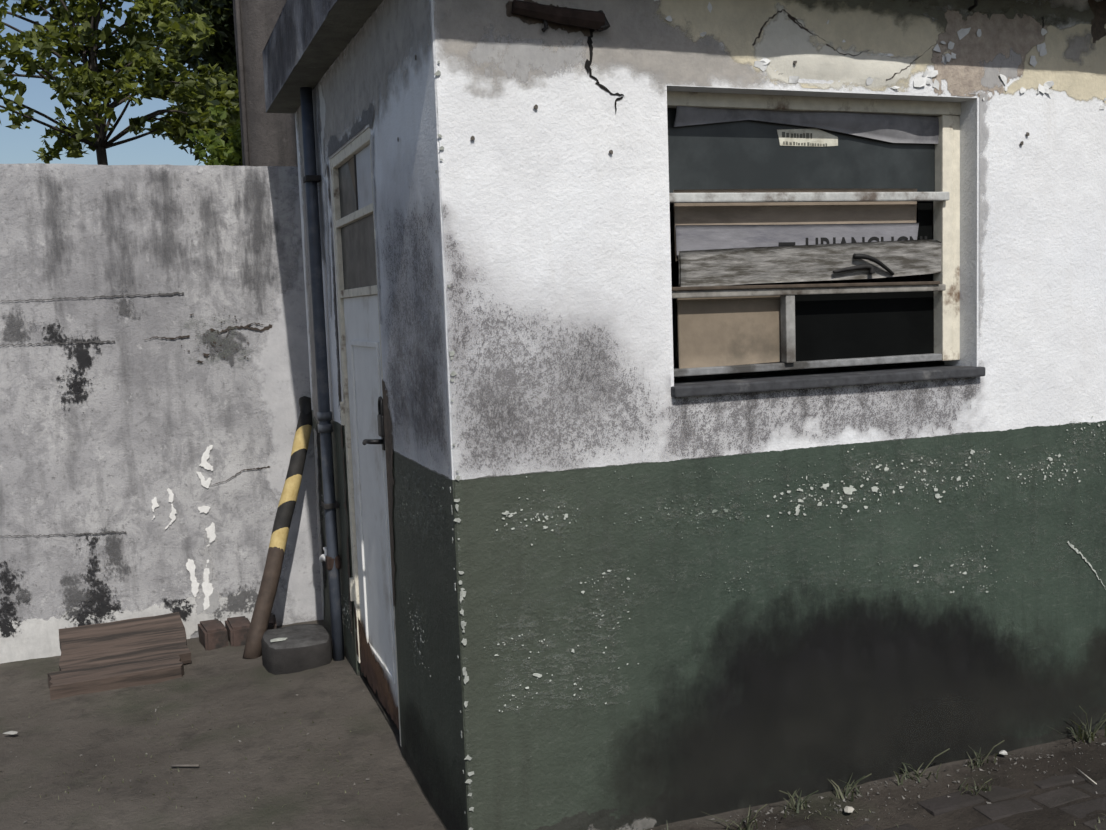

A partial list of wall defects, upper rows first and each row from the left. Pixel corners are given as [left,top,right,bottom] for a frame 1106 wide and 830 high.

crack [585,29,624,111]
peeling [654,0,1106,109]
leakage [919,0,1095,25]
leakage [236,167,274,290]
leakage [297,0,764,424]
leakage [1,310,101,415]
crack [145,323,272,352]
leakage [378,173,983,476]
peeling [60,528,132,626]
peeling [162,597,194,621]
corrosion [358,618,399,730]